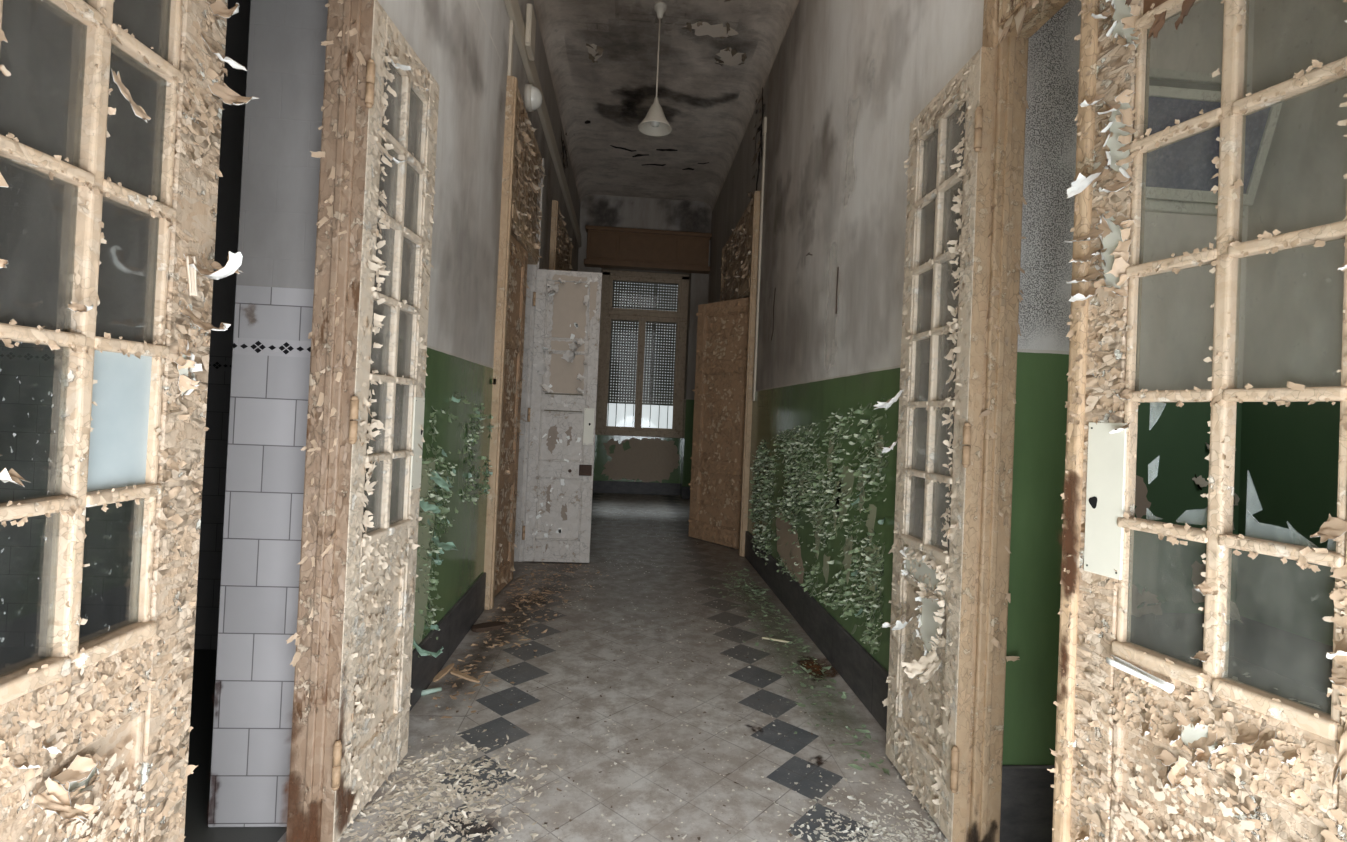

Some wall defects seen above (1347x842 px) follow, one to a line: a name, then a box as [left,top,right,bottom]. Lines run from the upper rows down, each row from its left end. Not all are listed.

peeling [321,19,357,46]
peeling [984,0,1047,64]
leakage [598,87,735,123]
peeling [310,151,356,235]
peeling [307,355,347,420]
peeling [301,438,338,456]
flaking render [339,17,976,842]
peeling [286,478,336,698]
peeling [975,636,1020,662]